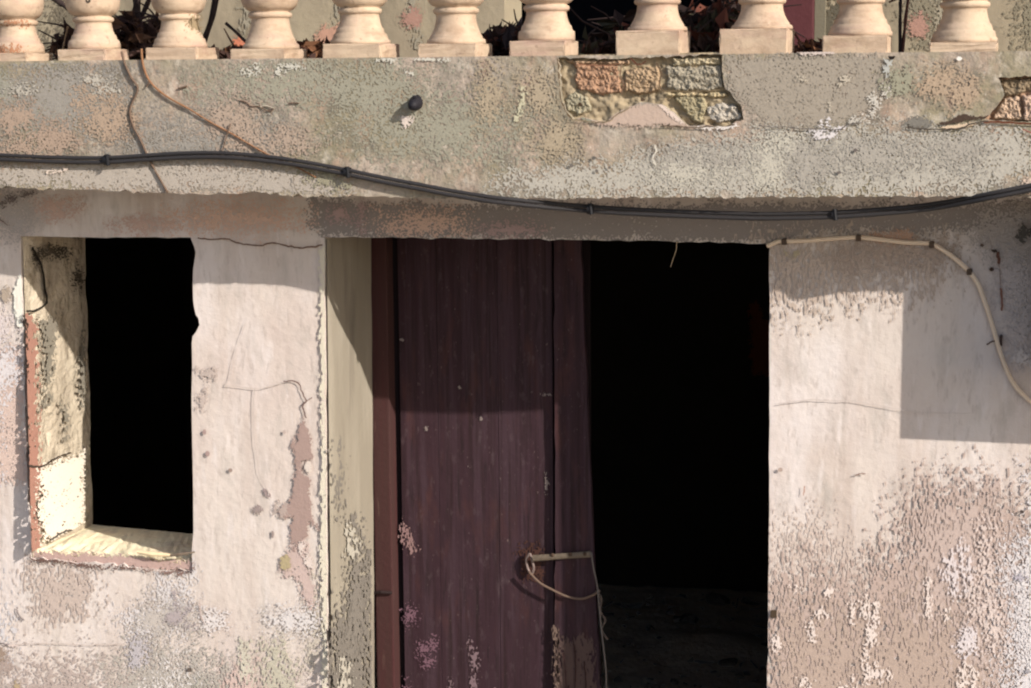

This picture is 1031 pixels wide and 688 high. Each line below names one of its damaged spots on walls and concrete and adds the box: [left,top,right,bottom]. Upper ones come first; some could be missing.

spalling [559,52,744,130]
flaking render [937,75,1031,129]
crack [198,237,323,249]
crack [224,380,312,418]
peeling [251,246,328,688]
damp [0,434,372,688]
peeling [767,445,1031,688]